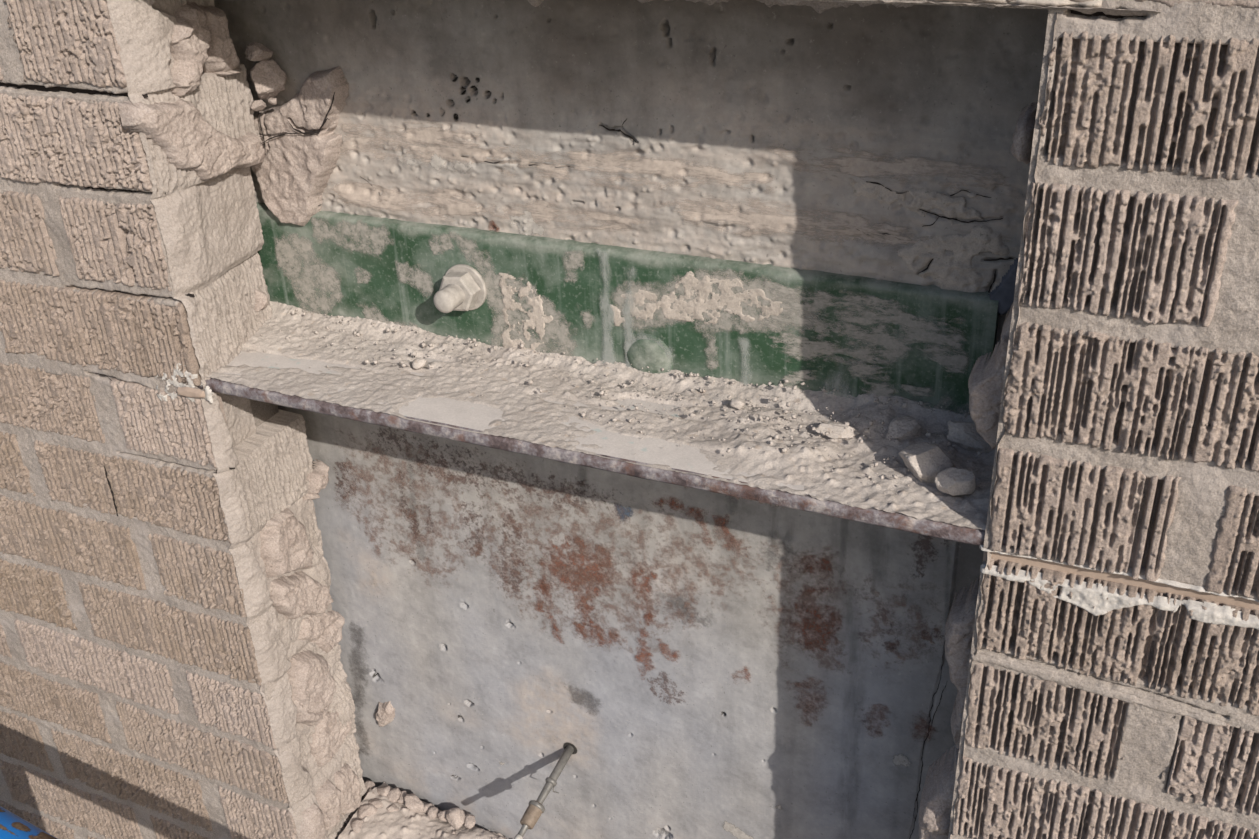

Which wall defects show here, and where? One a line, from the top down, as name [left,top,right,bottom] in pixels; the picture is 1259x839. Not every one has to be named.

crack [0,82,148,98]
peeling [275,218,390,316]
peeling [396,261,433,295]
peeling [430,231,575,356]
spalling [510,210,545,236]
peeling [564,251,583,282]
peeling [610,269,968,411]
crack [104,466,118,516]
corrosion [335,427,746,703]
corrosion [777,555,843,667]
crack [910,642,947,838]